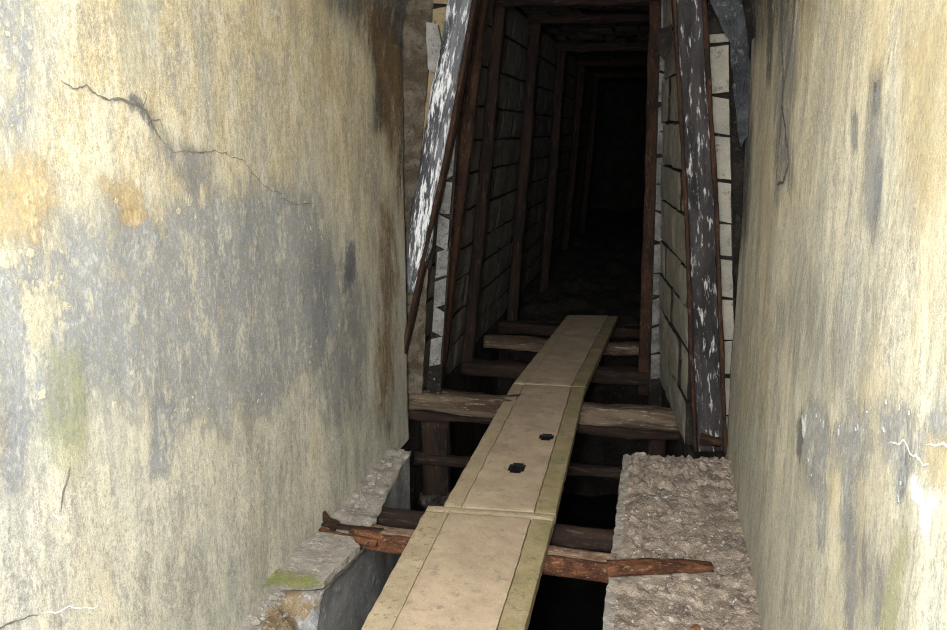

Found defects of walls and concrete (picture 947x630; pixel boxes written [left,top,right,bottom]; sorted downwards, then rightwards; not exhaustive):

crack [61,80,313,205]
crack [775,0,796,201]
water stain [851,79,882,231]
water stain [909,475,942,539]
crack [0,605,99,629]